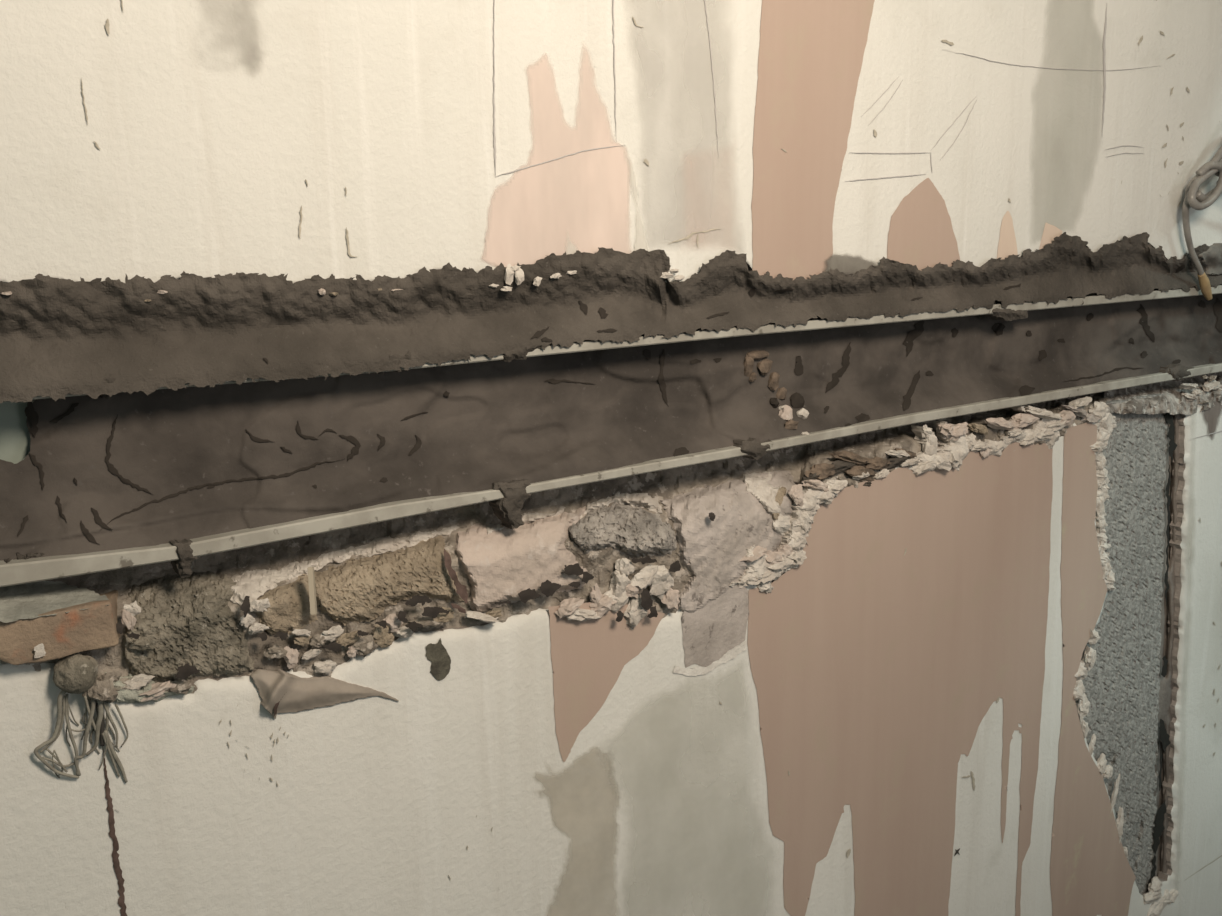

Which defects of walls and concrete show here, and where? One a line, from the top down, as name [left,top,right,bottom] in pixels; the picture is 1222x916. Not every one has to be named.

peeling [482,53,630,292]
peeling [749,0,875,297]
peeling [887,178,960,271]
crack [17,515,29,537]
crack [25,402,428,545]
spalling [25,658,61,671]
peeling [45,372,1222,916]